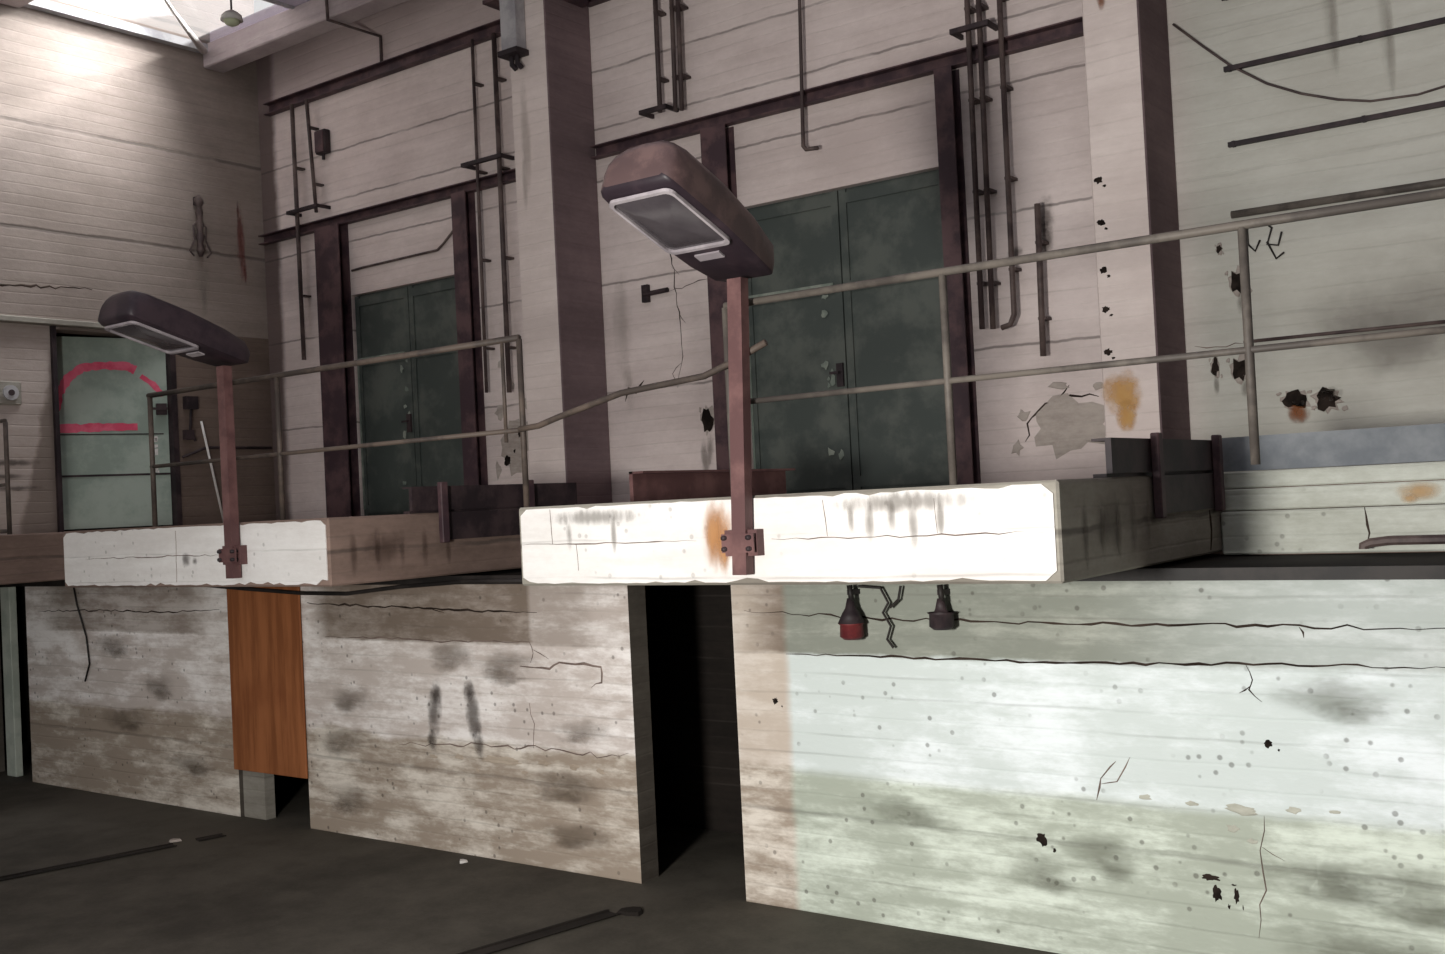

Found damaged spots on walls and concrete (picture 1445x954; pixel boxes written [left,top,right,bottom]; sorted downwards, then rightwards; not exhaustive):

crack [0,283,92,291]
crack [625,254,705,402]
peeling [494,360,529,479]
spalling [1011,382,1106,459]
corrosion [1109,380,1137,427]
corrosion [708,516,728,564]
crack [744,610,1445,702]
crack [1259,821,1281,935]